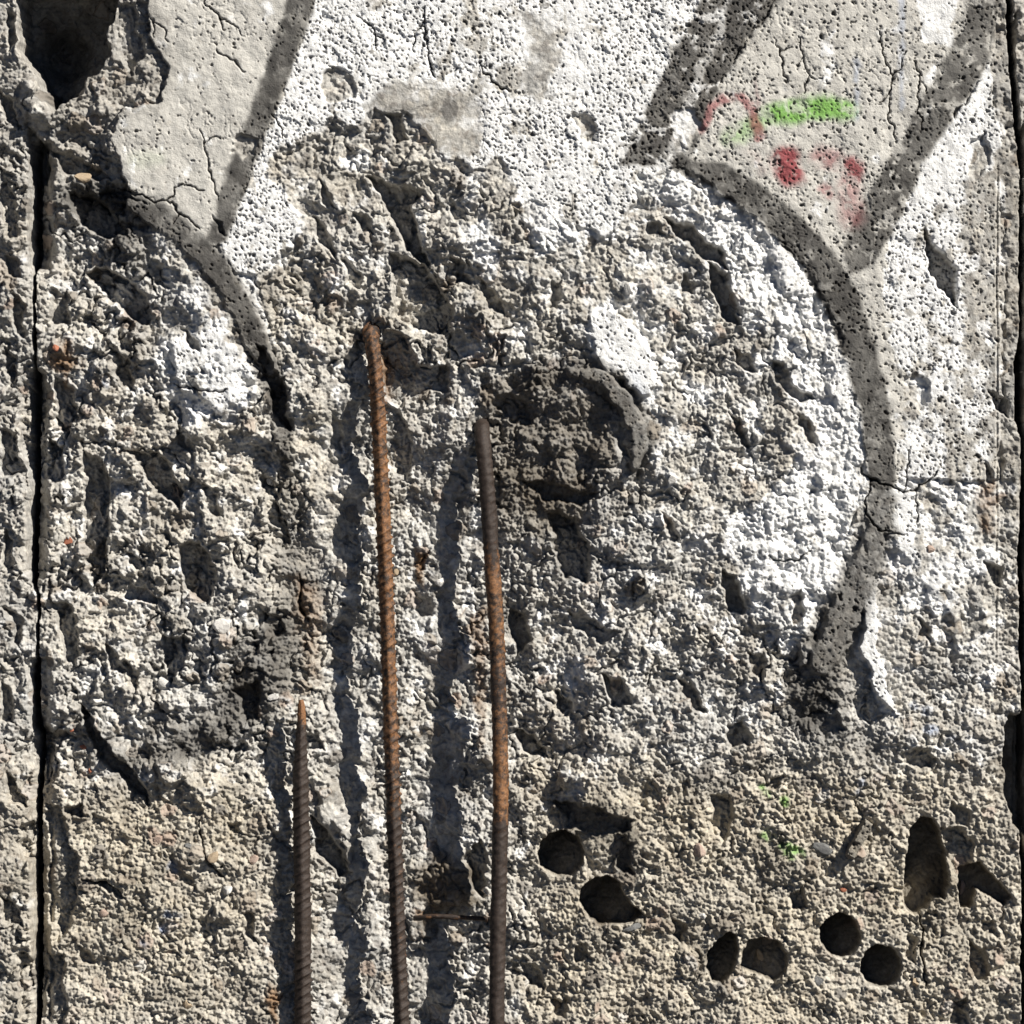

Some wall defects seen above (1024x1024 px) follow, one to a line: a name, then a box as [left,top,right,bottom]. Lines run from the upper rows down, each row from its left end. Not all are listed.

spalling [23,0,299,1024]
crack [118,129,222,230]
spalling [232,74,1024,1024]
crack [860,451,938,536]